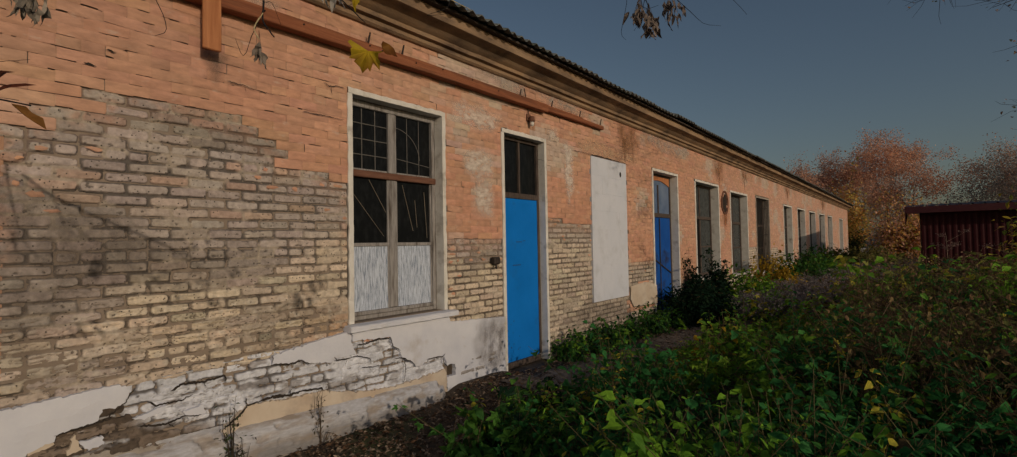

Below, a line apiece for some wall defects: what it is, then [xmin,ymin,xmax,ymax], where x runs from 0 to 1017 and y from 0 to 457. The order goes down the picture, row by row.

peeling [0,89,445,457]